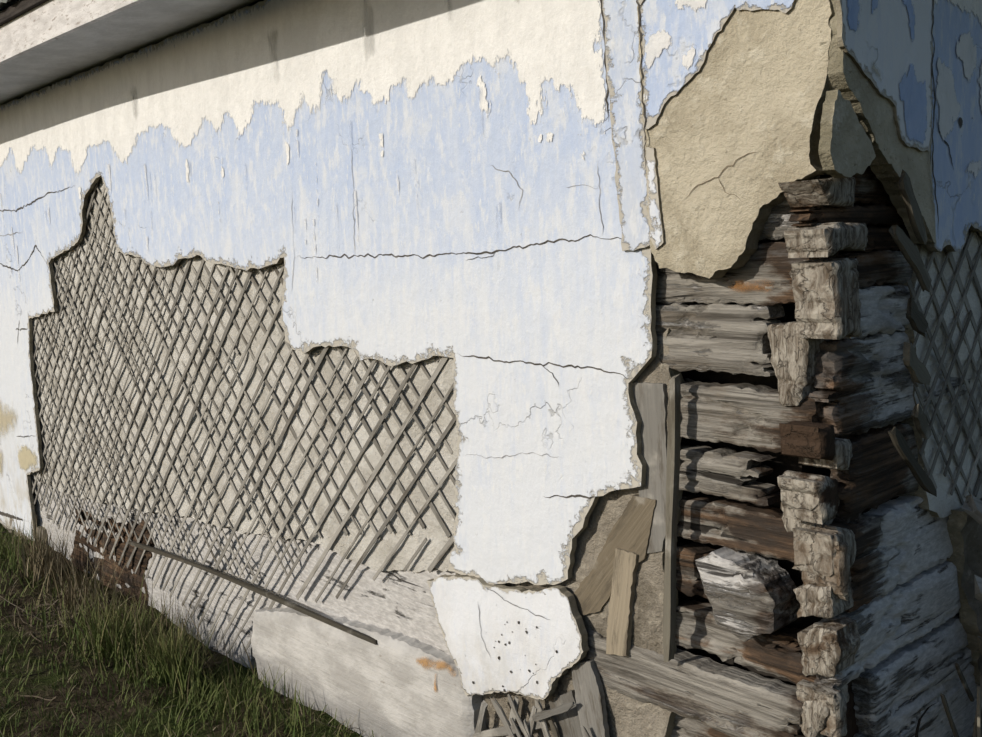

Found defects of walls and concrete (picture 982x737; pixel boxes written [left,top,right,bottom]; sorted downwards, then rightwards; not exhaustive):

peeling [0,0,606,183]
crack [0,186,73,271]
crack [291,145,621,291]
spalling [30,178,458,654]
crack [459,354,631,382]
spalling [637,0,982,686]
crack [546,492,595,500]
spalling [497,328,684,656]
corrosion [417,658,452,672]
spalling [473,657,676,737]